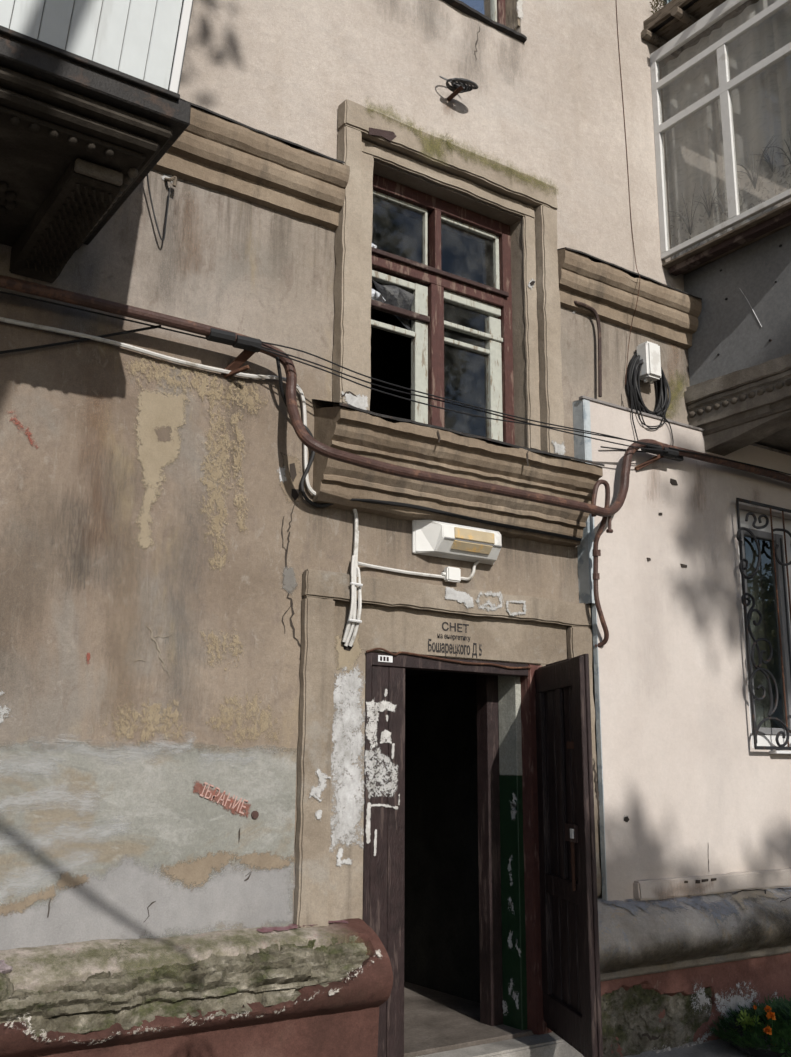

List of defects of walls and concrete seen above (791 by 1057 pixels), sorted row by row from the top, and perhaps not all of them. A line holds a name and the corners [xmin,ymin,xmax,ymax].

damp [367,105,553,188]
peeling [126,355,268,571]
crack [281,504,301,660]
peeling [309,635,365,867]
spalling [160,851,295,889]
peeling [601,878,791,927]
spalling [0,920,382,1045]
spalling [601,982,760,1057]